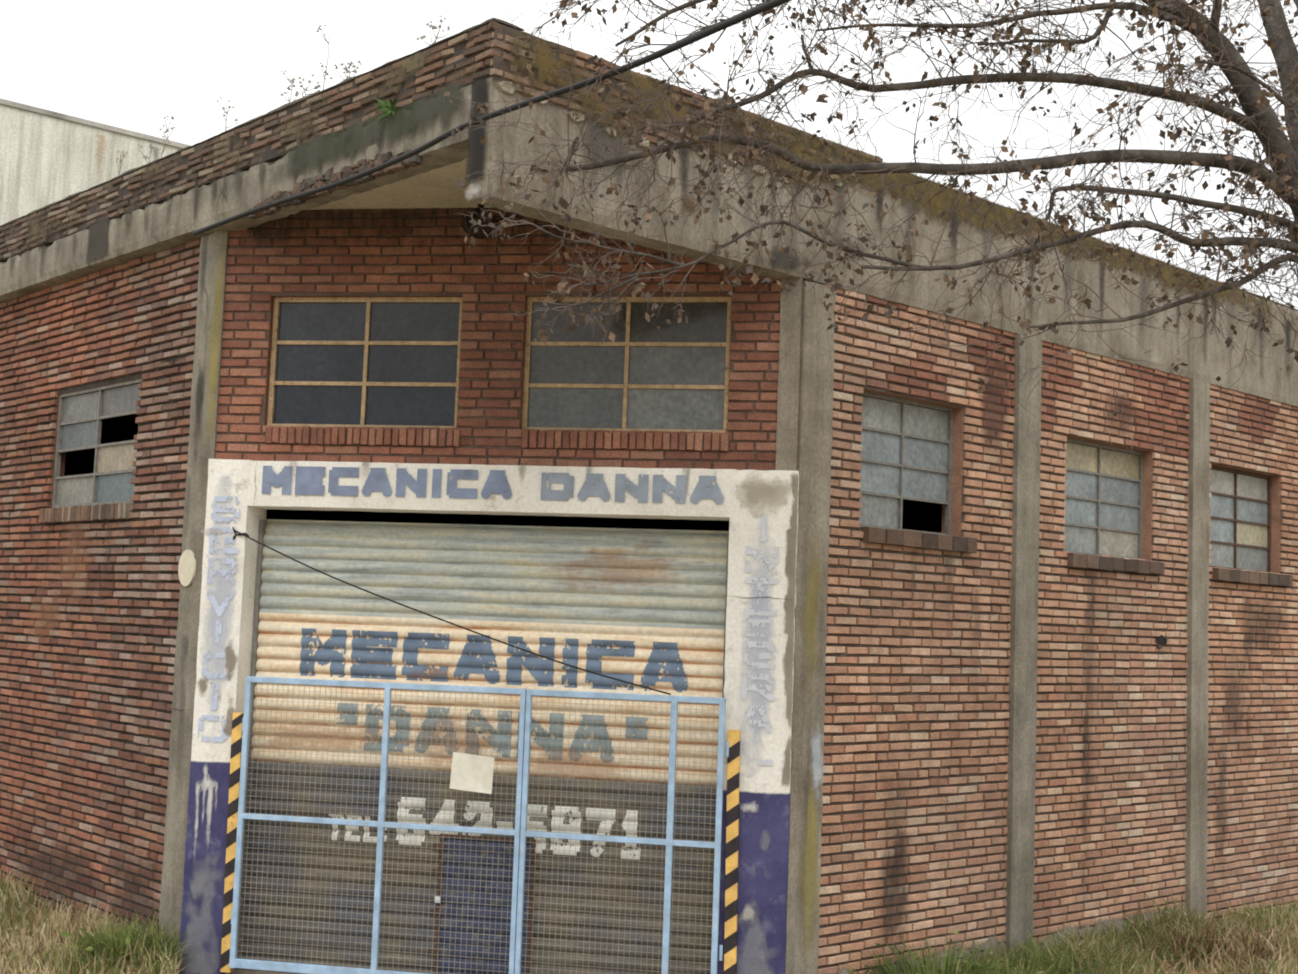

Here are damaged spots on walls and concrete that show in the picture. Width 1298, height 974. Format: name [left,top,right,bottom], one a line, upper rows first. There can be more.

damp [466,77,488,184]
damp [73,217,109,263]
damp [745,482,787,504]
peeling [225,646,236,679]
peeling [224,699,234,735]
peeling [738,907,772,974]